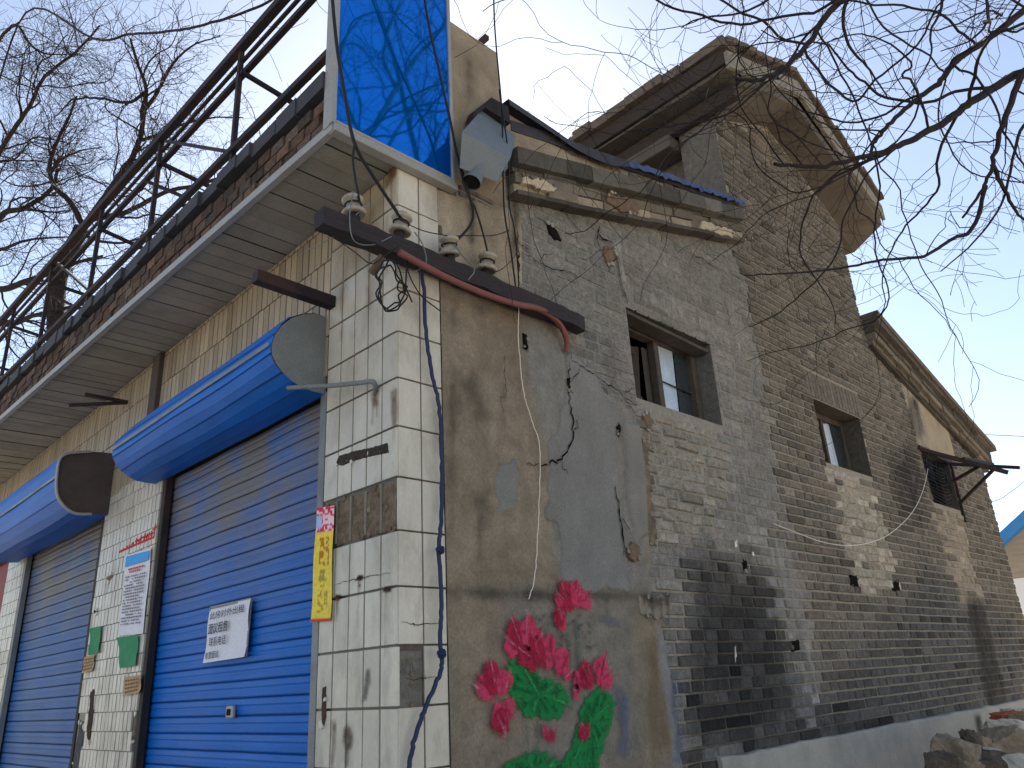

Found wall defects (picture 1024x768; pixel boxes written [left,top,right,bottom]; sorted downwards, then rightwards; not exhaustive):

spalling [519,172,557,194]
hole [545,220,562,242]
spalling [605,190,641,215]
crack [527,352,637,474]
spalling [335,443,389,466]
peeling [325,480,397,548]
peeling [626,411,660,562]
peeling [397,650,422,709]